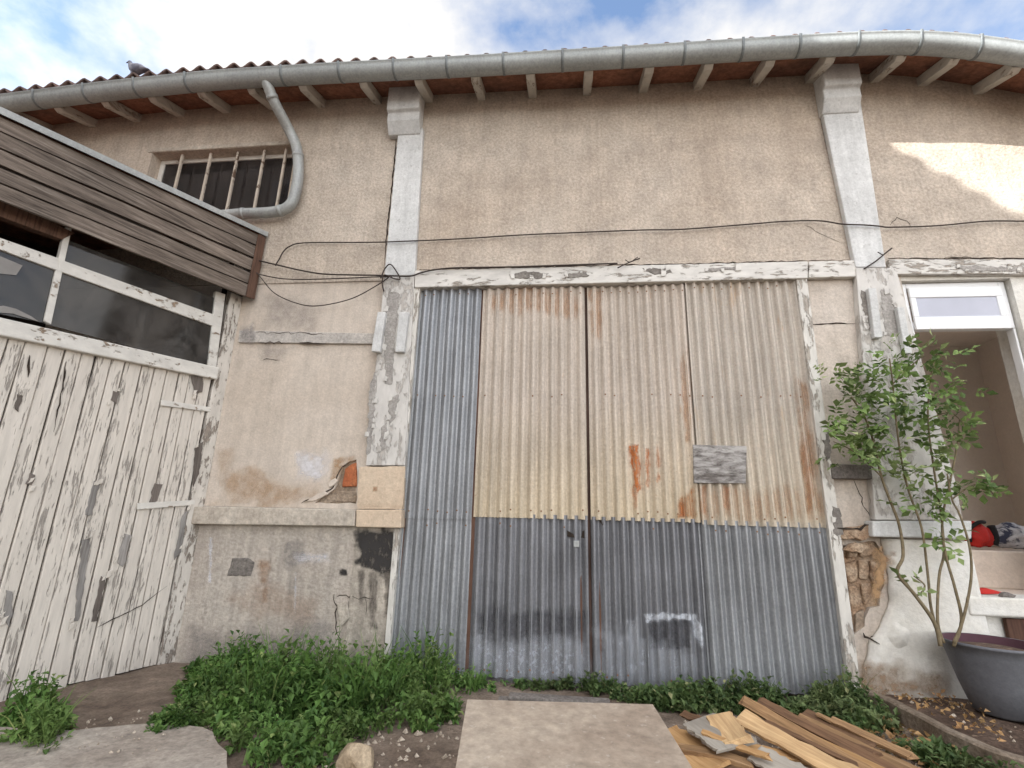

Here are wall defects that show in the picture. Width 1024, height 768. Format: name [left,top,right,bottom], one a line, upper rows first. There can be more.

peeling [860,287,897,336]
peeling [14,388,25,412]
peeling [191,375,204,399]
spalling [306,288,400,504]
rust [629,445,659,491]
peeling [85,479,104,515]
peeling [149,483,163,512]
peeling [170,442,203,568]
peeling [68,529,132,631]
leakage [340,528,394,628]
spalling [831,506,881,632]
crack [333,595,370,651]